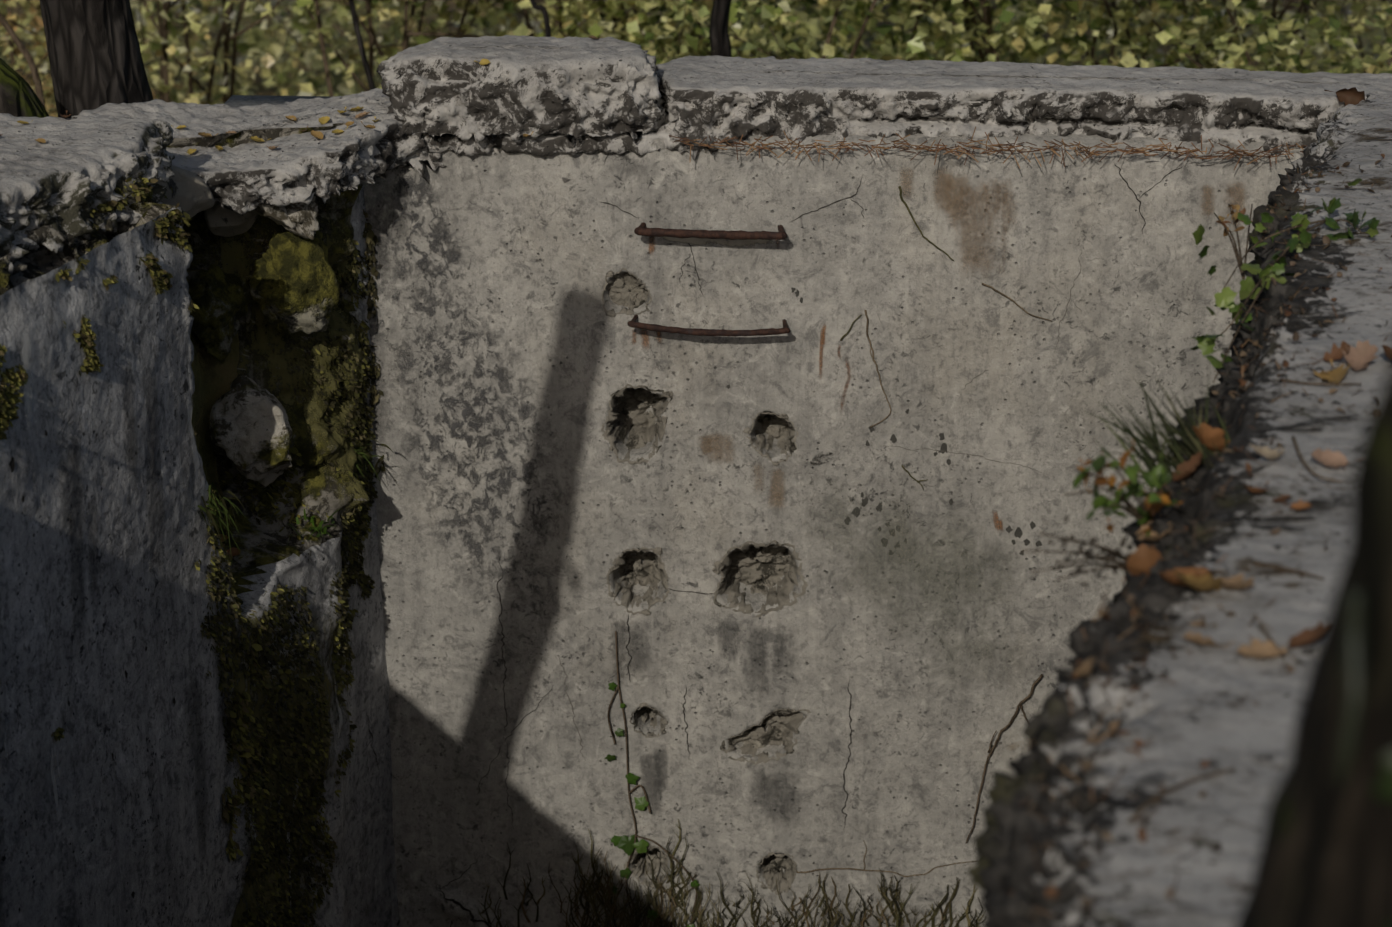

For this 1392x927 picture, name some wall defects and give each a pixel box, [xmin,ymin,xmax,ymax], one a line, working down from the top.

spalling [602,268,652,317]
spalling [601,384,674,465]
spalling [743,411,799,466]
spalling [606,547,670,616]
spalling [712,540,808,617]
spalling [629,703,668,738]
spalling [720,708,811,765]